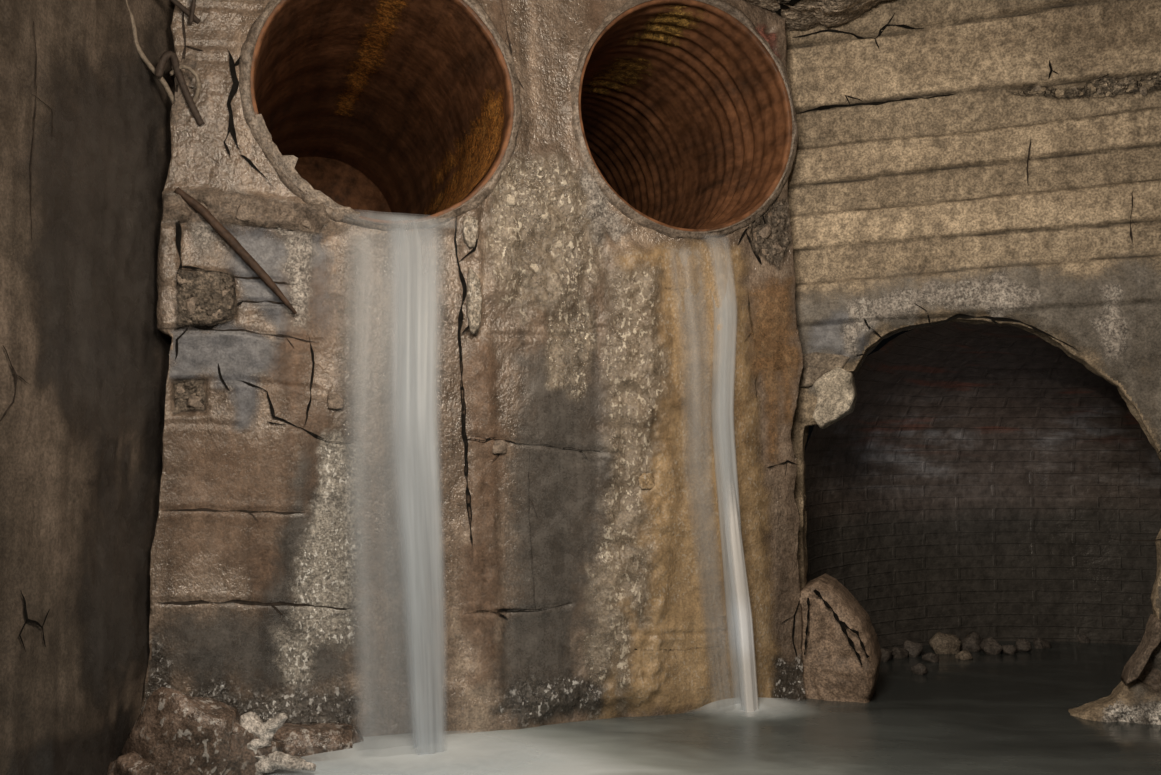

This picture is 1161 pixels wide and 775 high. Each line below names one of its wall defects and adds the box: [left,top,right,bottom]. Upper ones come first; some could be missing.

crack [175,12,271,185]
corrosion [335,0,406,117]
corrosion [424,90,504,217]
corrosion [628,5,696,46]
spalling [1009,71,1161,99]
leakage [27,52,364,725]
crack [174,219,351,444]
crack [454,216,606,620]
corrosion [597,240,777,719]
leakage [11,705,133,775]
spalling [1137,661,1161,693]